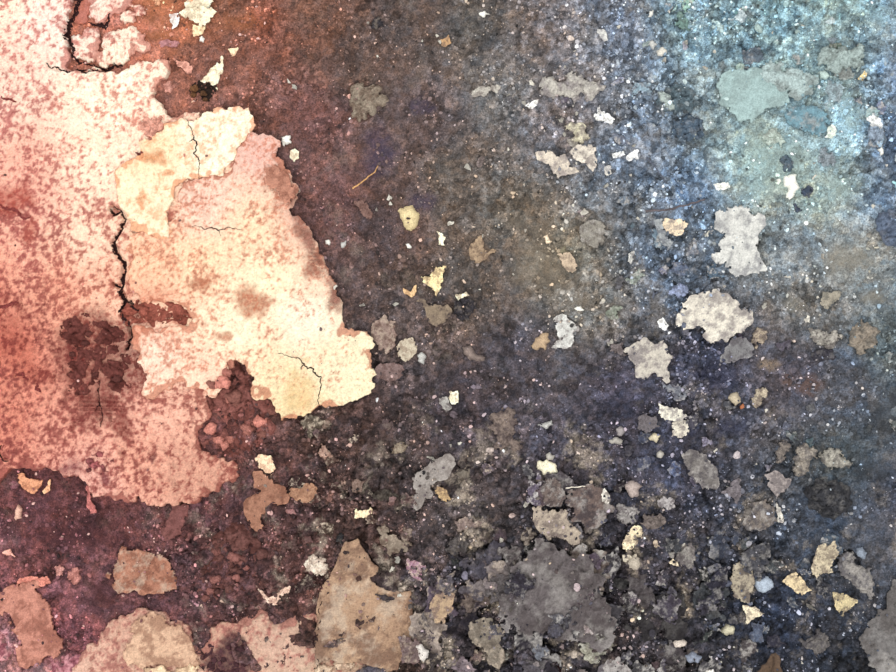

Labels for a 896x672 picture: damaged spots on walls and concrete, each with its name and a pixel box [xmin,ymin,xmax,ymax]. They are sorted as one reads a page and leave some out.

crack [46,0,123,74]
crack [187,120,200,175]
crack [110,206,139,350]
peeling [59,47,417,602]
peeling [17,473,51,494]
peeling [17,576,51,587]
peeling [258,586,291,605]
flaking render [203,643,247,672]